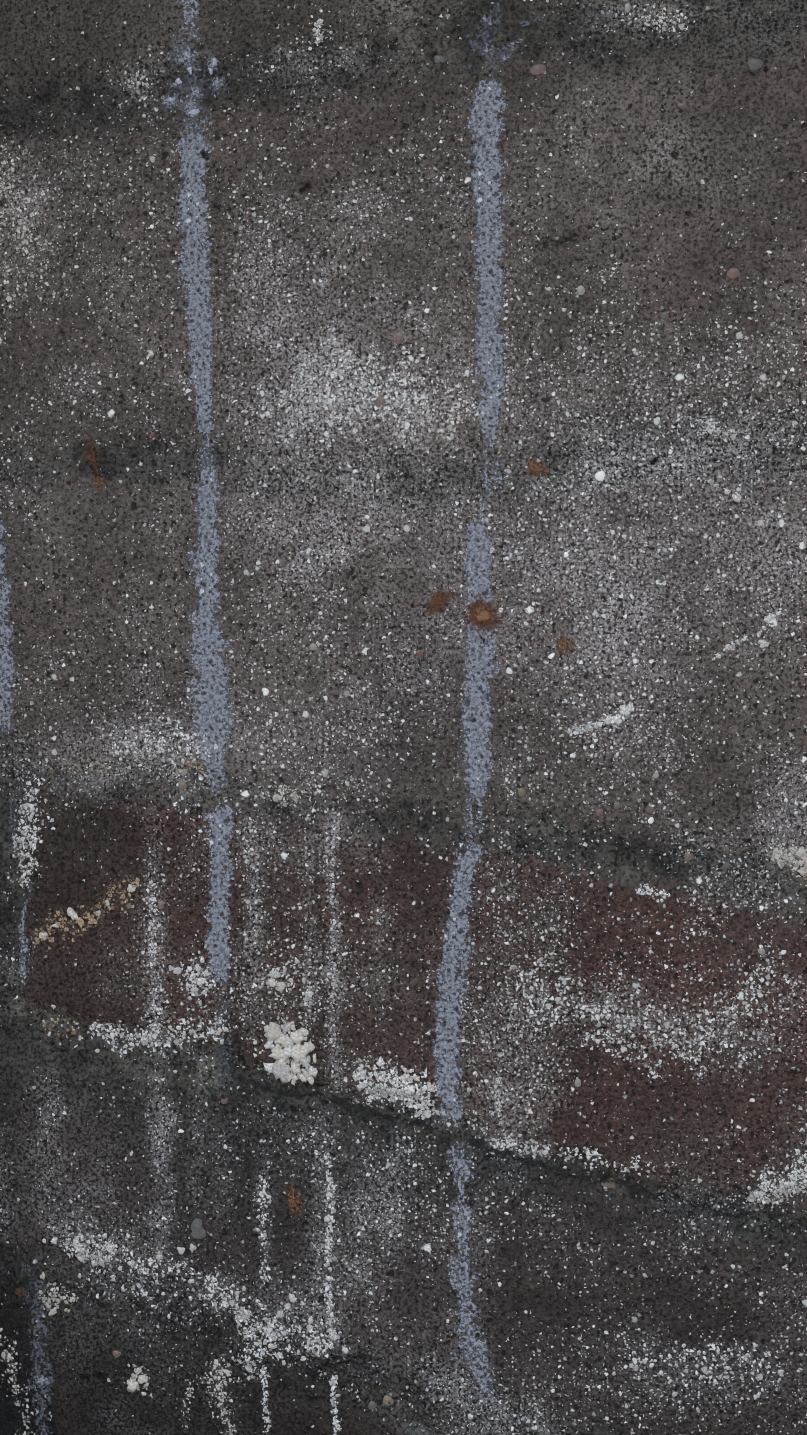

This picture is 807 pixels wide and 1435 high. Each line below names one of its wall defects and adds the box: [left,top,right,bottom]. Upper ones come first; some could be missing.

water stain [0,0,536,1127]
corrosion [426,588,503,631]
efflorescence [490,953,797,1083]
water stain [0,1154,351,1435]
water stain [448,1069,650,1406]
efflorescence [745,1123,807,1211]